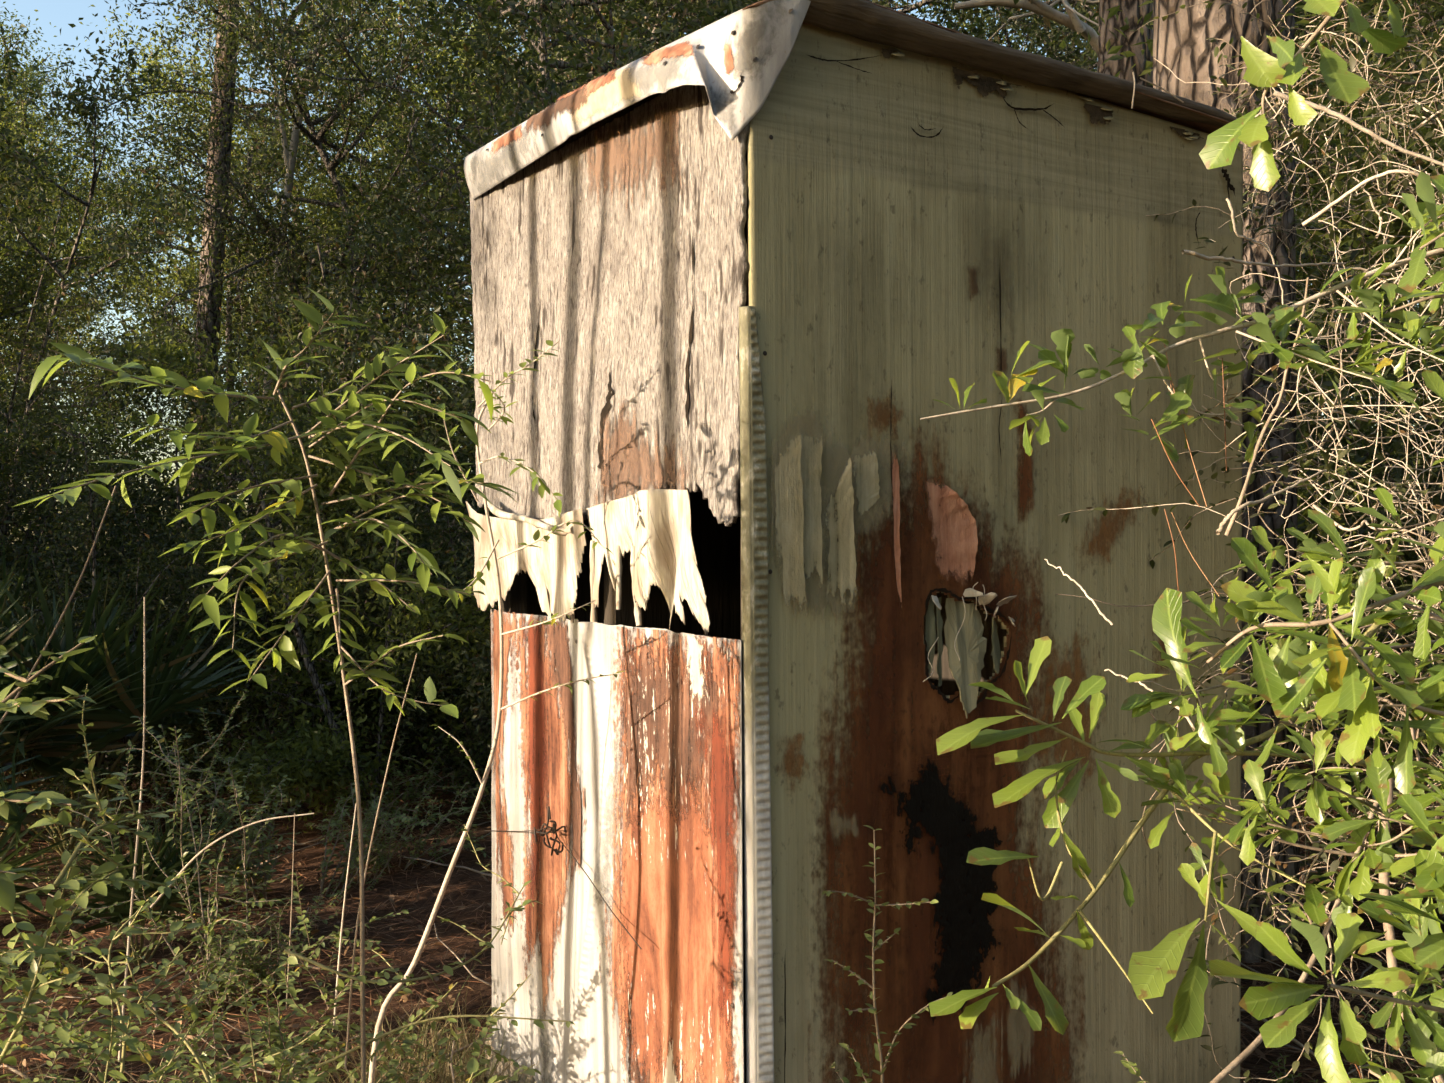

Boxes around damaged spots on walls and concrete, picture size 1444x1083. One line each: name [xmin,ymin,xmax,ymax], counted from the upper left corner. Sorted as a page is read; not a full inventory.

corrosion [491,41,695,153]
corrosion [491,609,586,1019]
corrosion [597,626,743,1083]
corrosion [777,429,1094,1083]
peeling [963,588,1017,626]
corrosion [1017,400,1034,520]